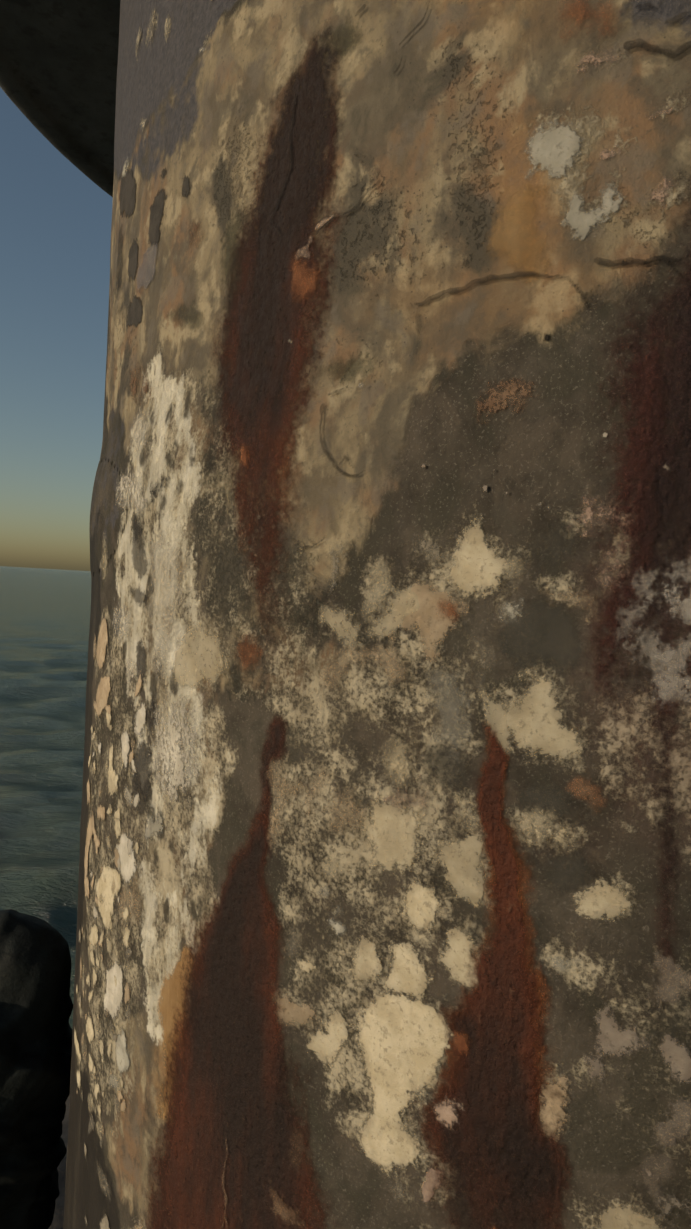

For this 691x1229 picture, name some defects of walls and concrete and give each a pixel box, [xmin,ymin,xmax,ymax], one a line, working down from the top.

corrosion [218,27,339,583]
leakage [115,467,147,513]
leakage [499,599,582,669]
leakage [665,588,691,624]
leakage [153,697,204,810]
corrosion [422,726,570,1229]